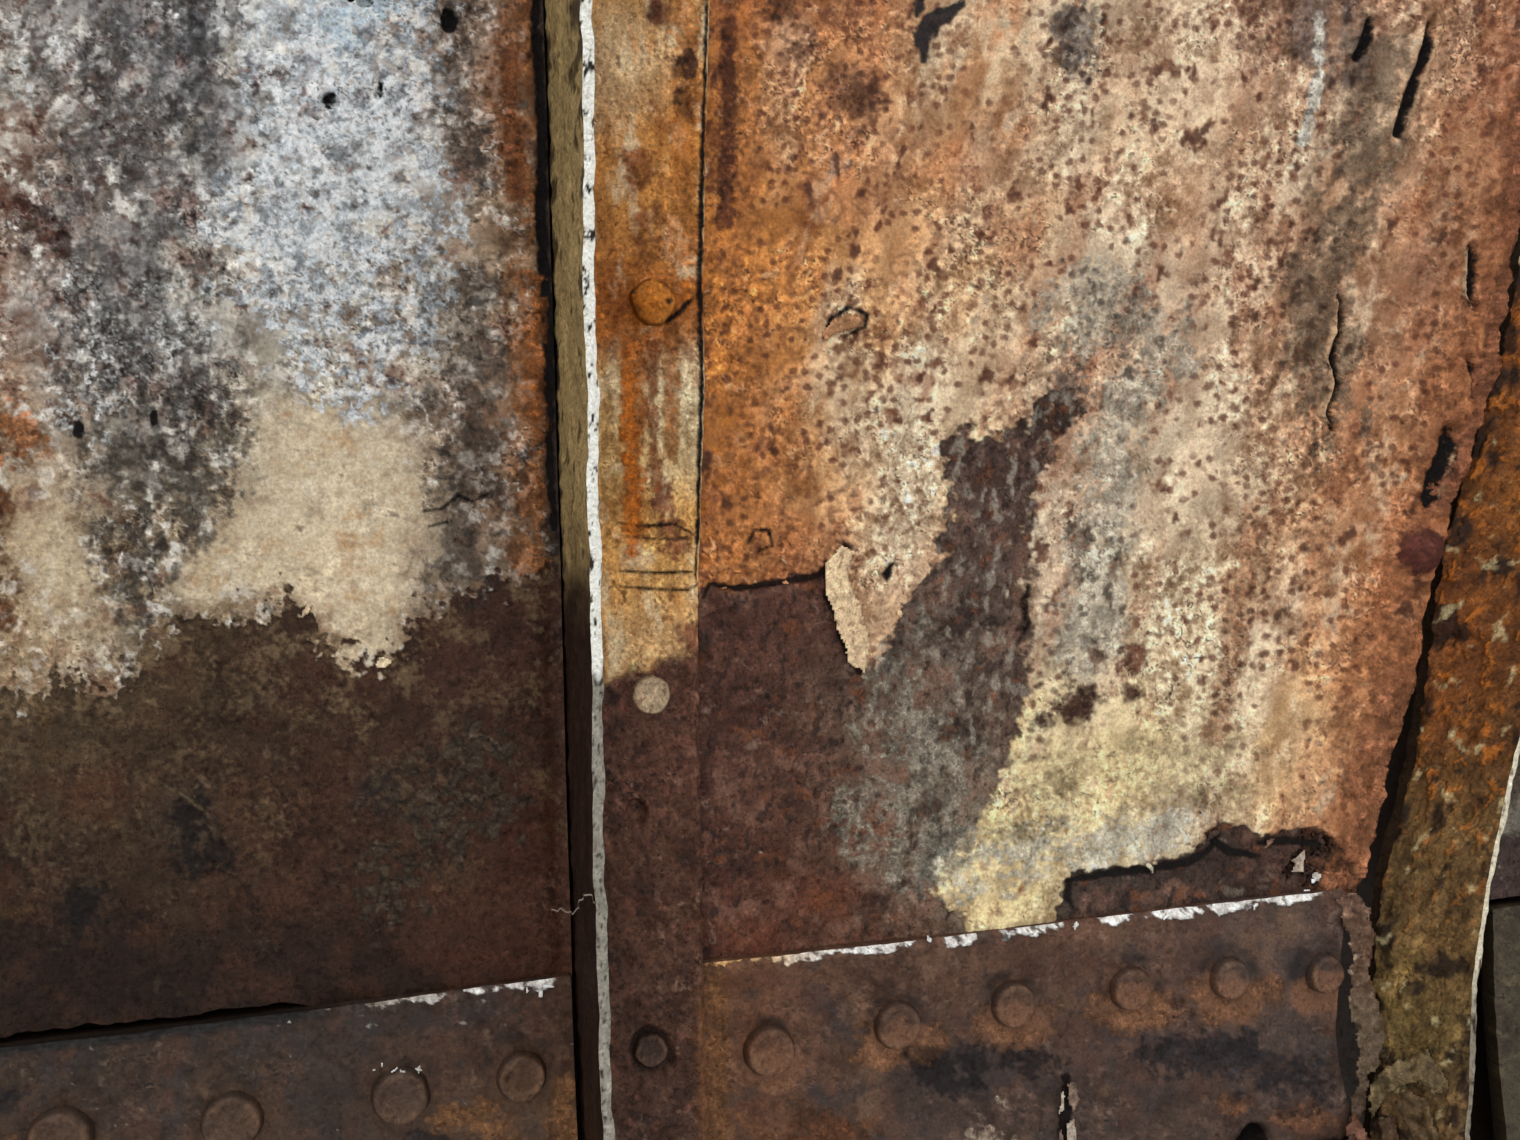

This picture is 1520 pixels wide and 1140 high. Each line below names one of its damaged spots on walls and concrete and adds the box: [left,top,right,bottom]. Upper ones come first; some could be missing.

crack [1352,16,1374,62]
crack [1392,23,1439,138]
leakage [0,0,512,627]
rust [619,0,821,593]
crack [1461,245,1477,307]
crack [1420,426,1458,508]
rust [0,488,27,632]
rust [1031,643,1148,728]
peeling [602,379,1084,1140]
peeling [1055,822,1348,930]
rust [1218,893,1387,1140]
rust [546,1071,578,1140]